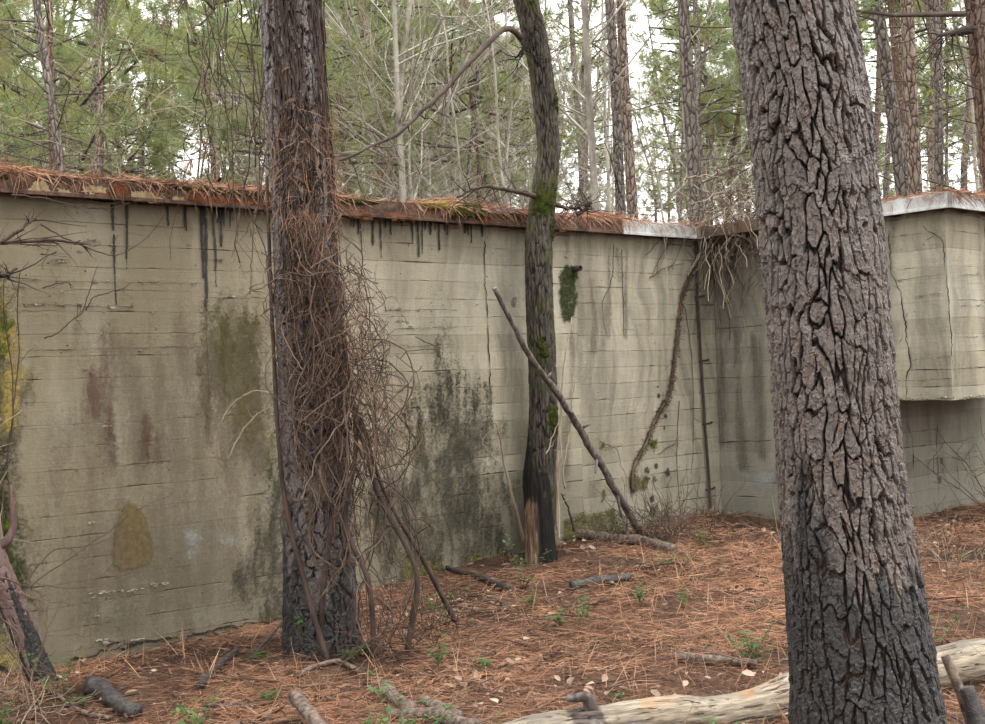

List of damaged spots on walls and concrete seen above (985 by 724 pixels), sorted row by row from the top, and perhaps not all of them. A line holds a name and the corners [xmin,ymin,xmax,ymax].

water stain [111,204,129,305]
water stain [197,206,280,476]
water stain [0,349,33,533]
water stain [113,501,153,570]